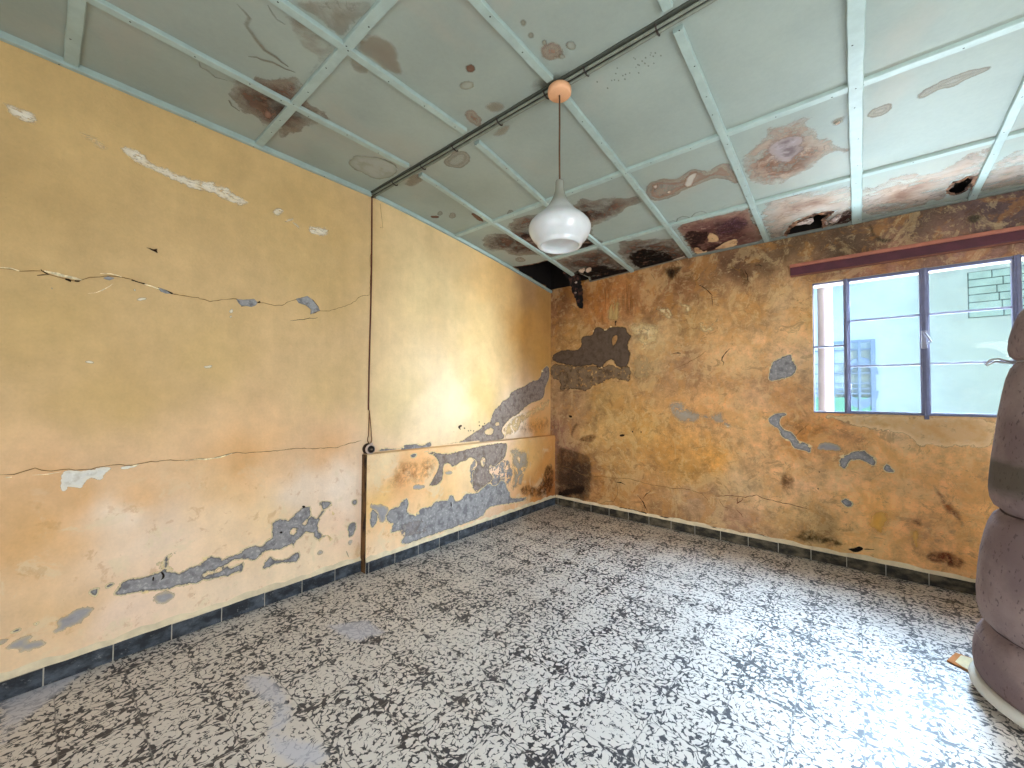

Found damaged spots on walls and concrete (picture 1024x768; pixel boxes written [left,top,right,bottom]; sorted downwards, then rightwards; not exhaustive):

water stain [229,44,317,130]
water stain [748,122,847,183]
water stain [486,152,985,280]
peeling [796,214,841,226]
crack [0,255,371,321]
peeling [60,466,136,491]
crack [4,441,358,478]
spalling [352,321,632,545]
water stain [521,415,595,500]
spalling [768,412,895,473]
spalling [0,500,335,652]